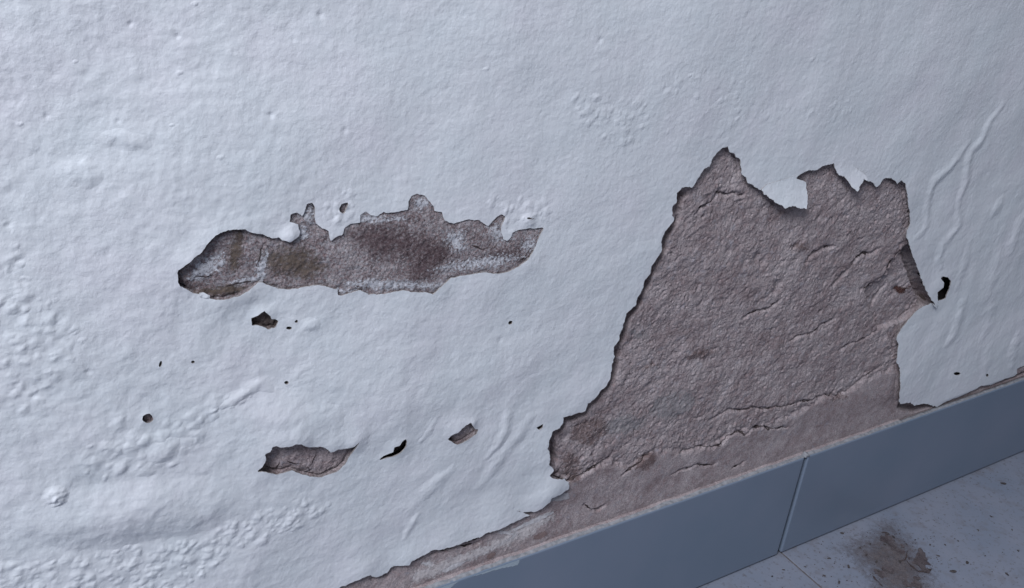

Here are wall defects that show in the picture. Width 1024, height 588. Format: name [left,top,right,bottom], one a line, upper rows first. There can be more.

peeling [177,194,543,299]
peeling [251,311,278,329]
flaking render [340,147,1024,588]